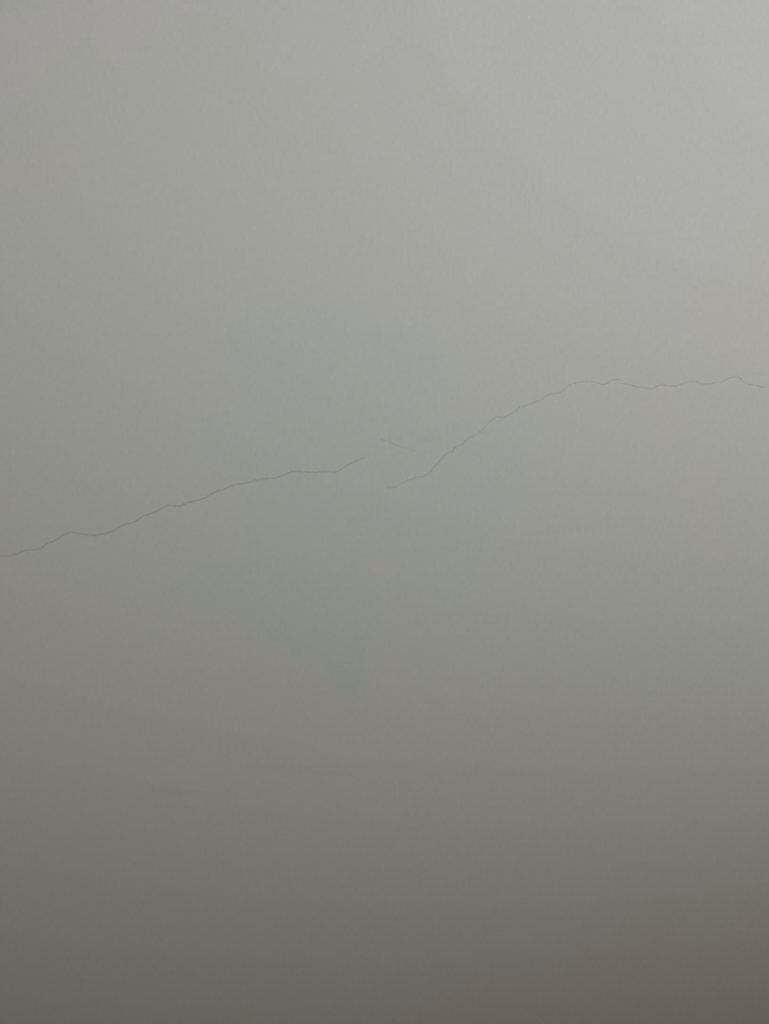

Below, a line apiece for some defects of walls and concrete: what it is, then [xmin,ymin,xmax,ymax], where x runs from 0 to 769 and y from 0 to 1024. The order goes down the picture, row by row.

crack [386,376,769,488]
crack [0,457,365,557]